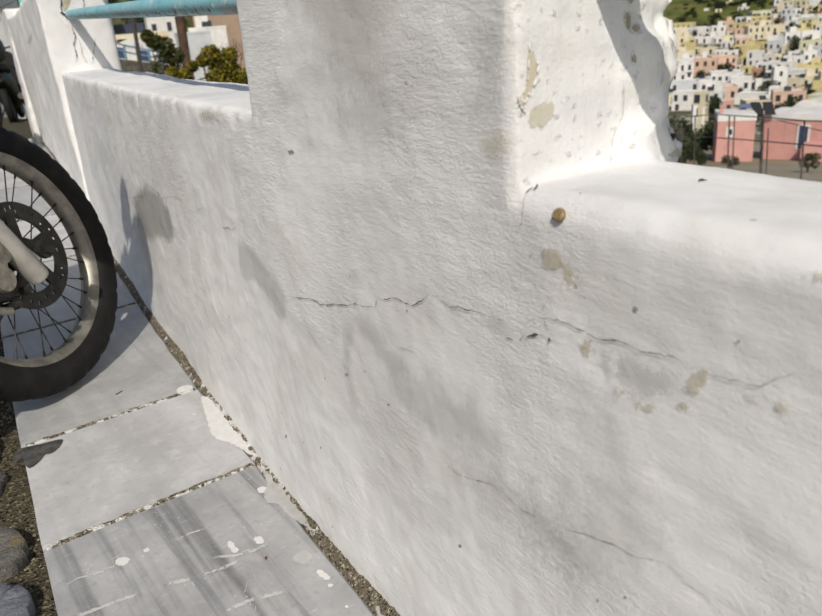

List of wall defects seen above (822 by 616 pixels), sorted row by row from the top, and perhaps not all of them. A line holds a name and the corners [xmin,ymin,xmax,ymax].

peeling [518,44,554,127]
peeling [541,248,578,285]
crack [295,295,798,387]